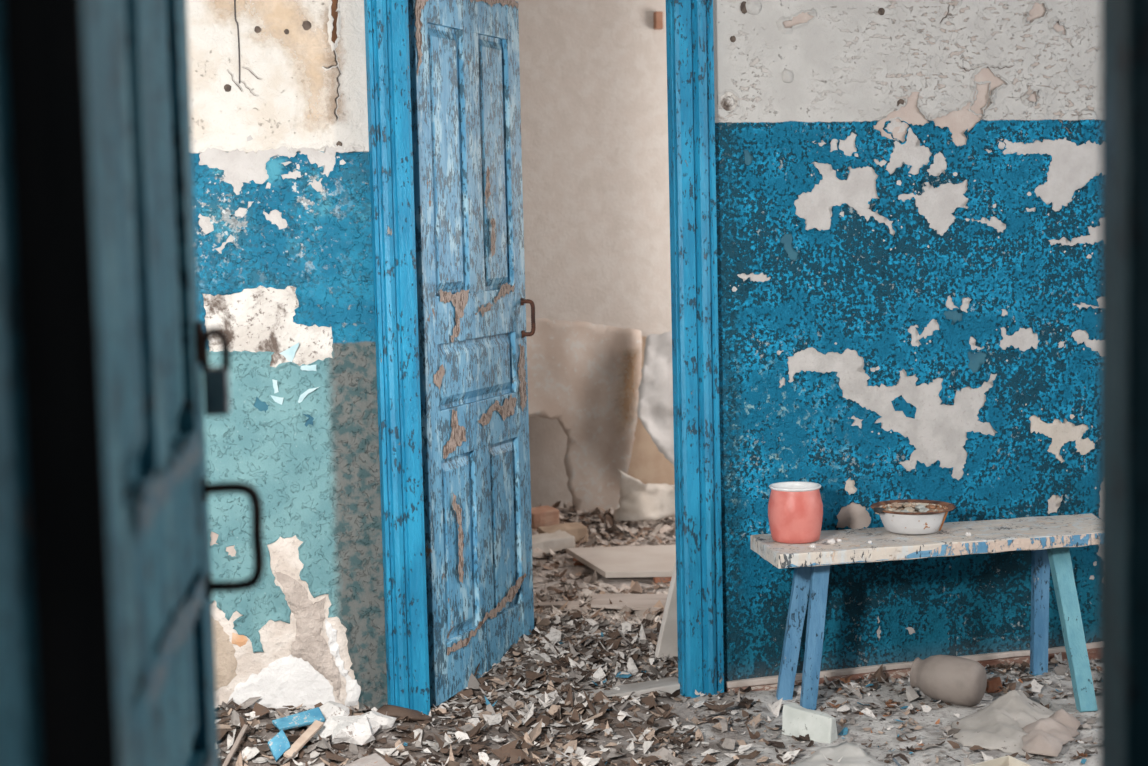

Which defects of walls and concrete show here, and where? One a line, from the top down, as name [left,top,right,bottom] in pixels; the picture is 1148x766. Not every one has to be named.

peeling [776,8,816,34]
peeling [1022,0,1067,37]
crack [322,48,342,121]
flaking render [718,89,740,114]
peeling [193,135,365,257]
peeling [776,63,1101,265]
peeling [730,268,773,292]
peeling [199,282,337,416]
peeling [298,387,319,429]
peeling [774,291,1100,483]
peeling [209,528,240,560]
flaking render [212,532,364,710]